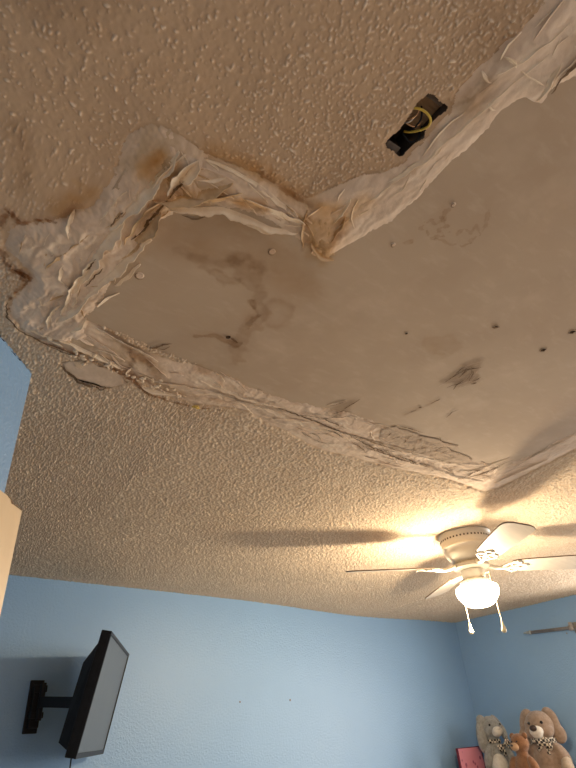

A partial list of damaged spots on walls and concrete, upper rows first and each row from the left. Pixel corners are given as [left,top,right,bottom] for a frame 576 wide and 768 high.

peeling [40,151,334,340]
spalling [61,360,127,391]
peeling [379,426,472,464]